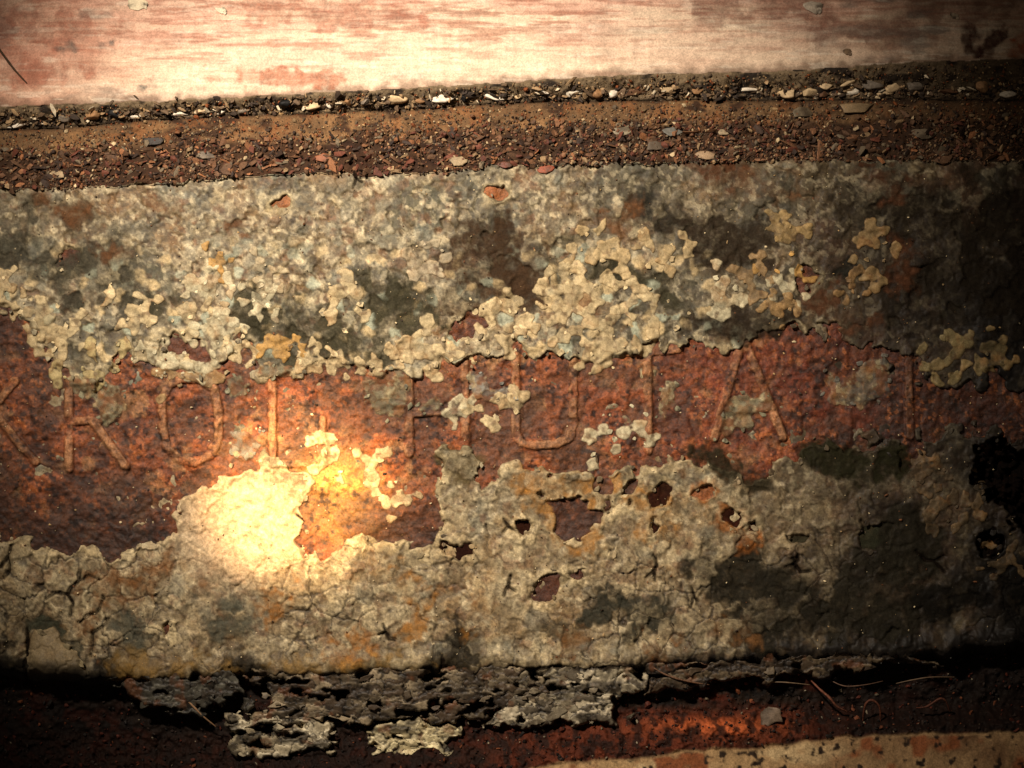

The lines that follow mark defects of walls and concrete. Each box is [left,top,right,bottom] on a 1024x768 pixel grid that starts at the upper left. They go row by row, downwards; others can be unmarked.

peeling [0,219,698,434]
peeling [916,325,1020,387]
rust [0,265,1024,563]
peeling [305,430,423,524]
spalling [540,381,681,543]
crack [0,543,14,577]
crack [20,628,29,683]
crack [51,571,107,654]
peeling [106,648,946,760]
crack [509,663,670,671]
crack [648,555,658,580]
rust [433,652,1024,768]